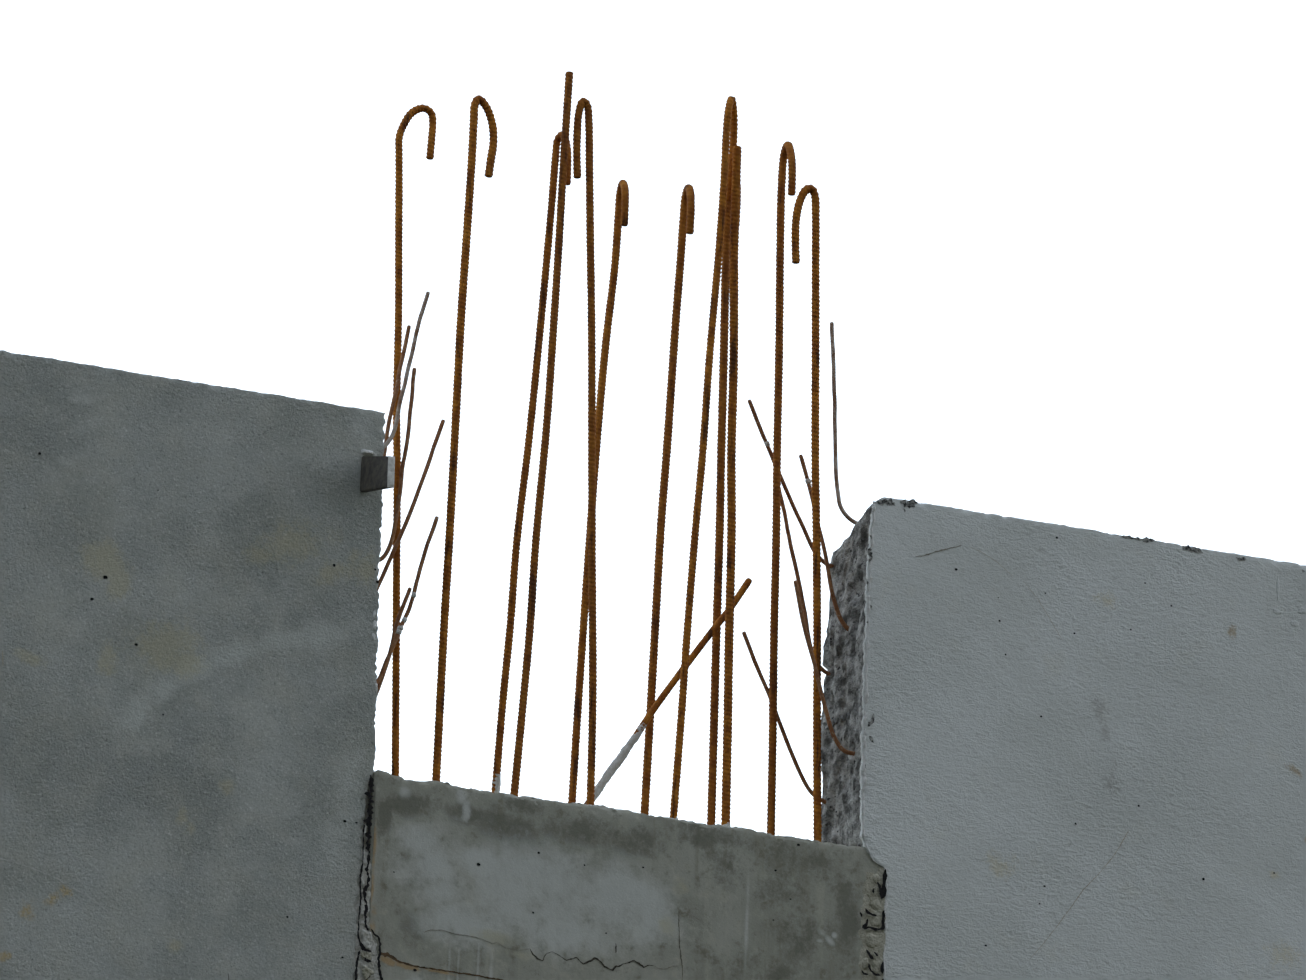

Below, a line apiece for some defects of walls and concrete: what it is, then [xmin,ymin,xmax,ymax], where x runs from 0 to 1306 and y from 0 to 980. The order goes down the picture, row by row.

spalling [858,498,918,980]
crack [355,775,503,980]
crack [425,912,699,977]